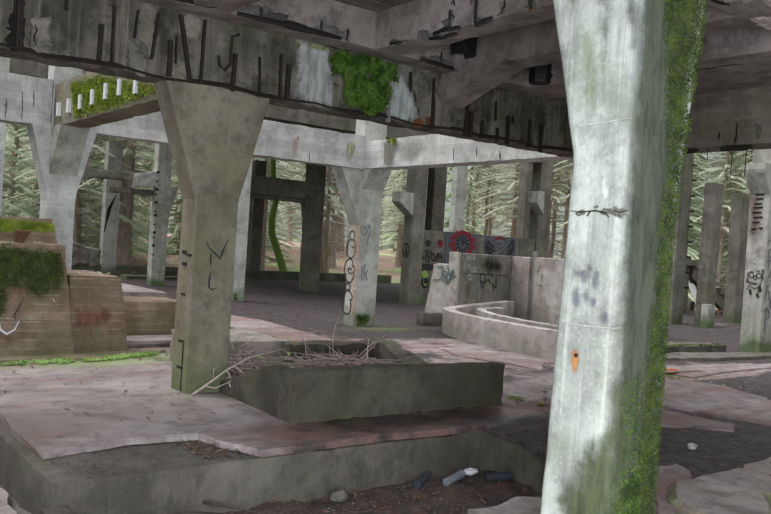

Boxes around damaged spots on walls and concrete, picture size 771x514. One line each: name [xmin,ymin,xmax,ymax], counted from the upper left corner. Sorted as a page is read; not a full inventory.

spalling [0,0,572,152]
crack [574,209,629,217]